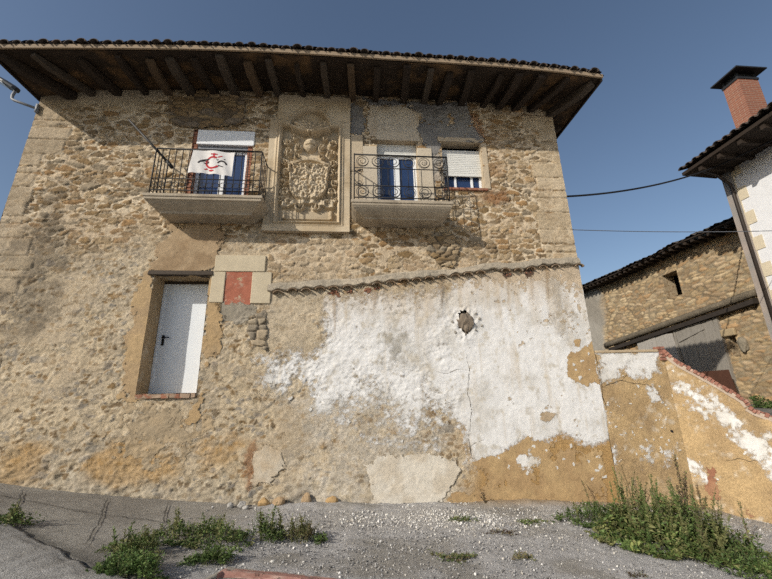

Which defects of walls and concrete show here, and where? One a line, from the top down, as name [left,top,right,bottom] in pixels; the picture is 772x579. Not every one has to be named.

peeling [253,269,772,503]
crack [595,354,662,405]